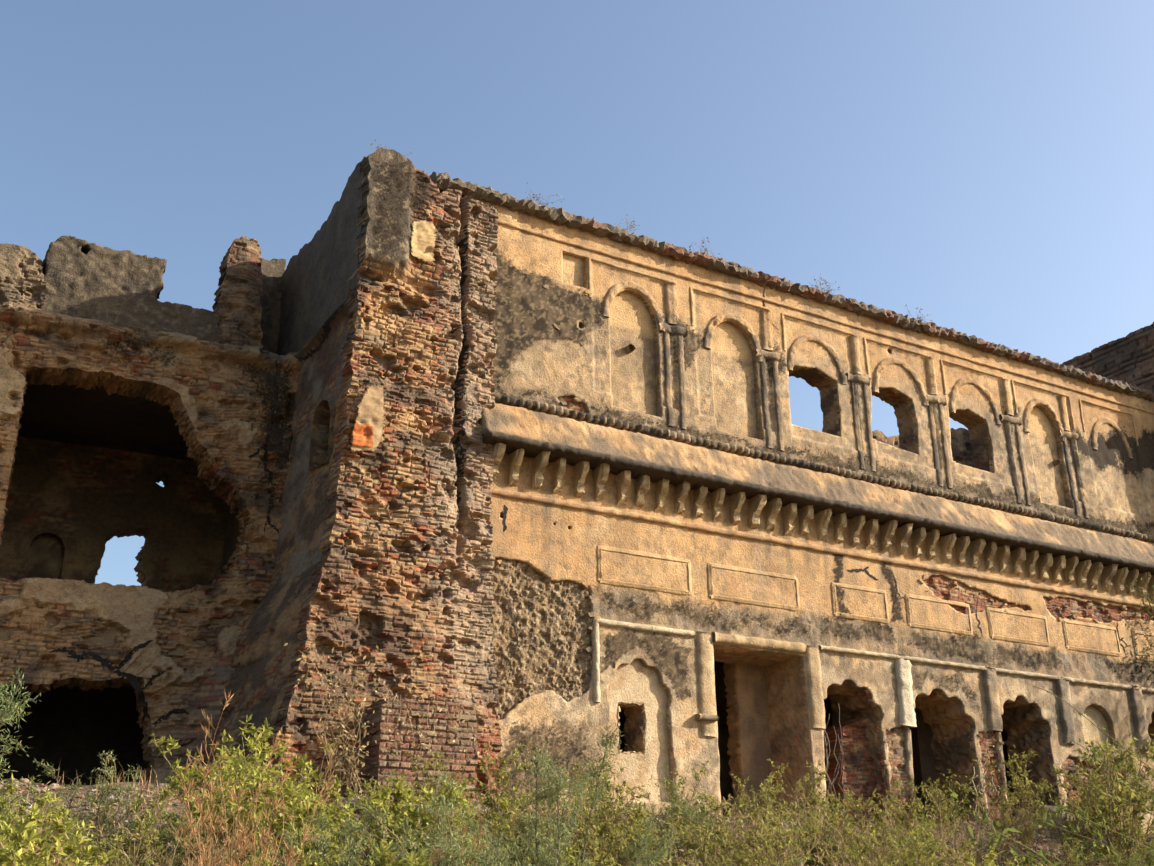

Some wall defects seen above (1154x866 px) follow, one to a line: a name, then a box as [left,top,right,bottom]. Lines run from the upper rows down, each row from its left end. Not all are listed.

flaking render [351,385,386,453]
crack [448,225,469,534]
water stain [494,384,558,405]
water stain [591,398,1154,535]
flaking render [491,558,596,720]
water stain [598,554,1065,724]
flaking render [918,575,1028,614]
flaking render [1043,595,1154,623]